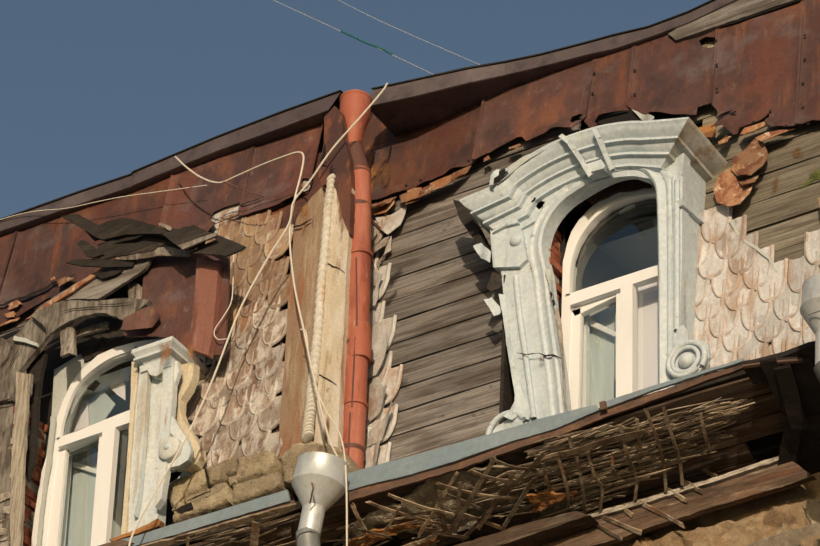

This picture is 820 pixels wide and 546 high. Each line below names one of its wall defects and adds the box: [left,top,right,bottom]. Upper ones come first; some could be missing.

peeling [713,122,794,207]
peeling [371,166,471,209]
peeling [50,277,75,287]
peeling [0,300,22,327]
crack [519,353,562,361]
spalling [0,491,11,546]